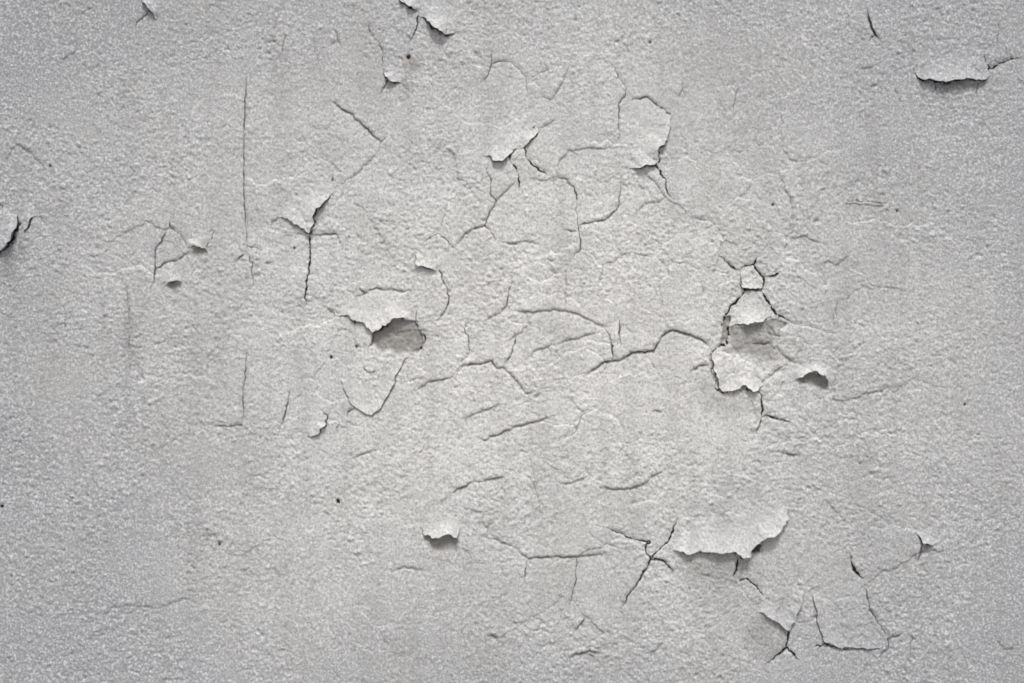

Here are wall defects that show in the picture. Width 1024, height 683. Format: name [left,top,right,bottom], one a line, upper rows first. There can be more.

peeling [911,27,1021,96]
peeling [614,66,671,196]
crack [424,172,538,248]
crack [553,176,668,257]
peeling [337,291,426,415]
crack [418,282,712,394]
peeling [710,266,834,415]
crack [719,255,839,370]
peeling [422,511,461,550]
crack [440,468,666,657]
crack [611,521,677,605]
peeling [672,506,789,559]